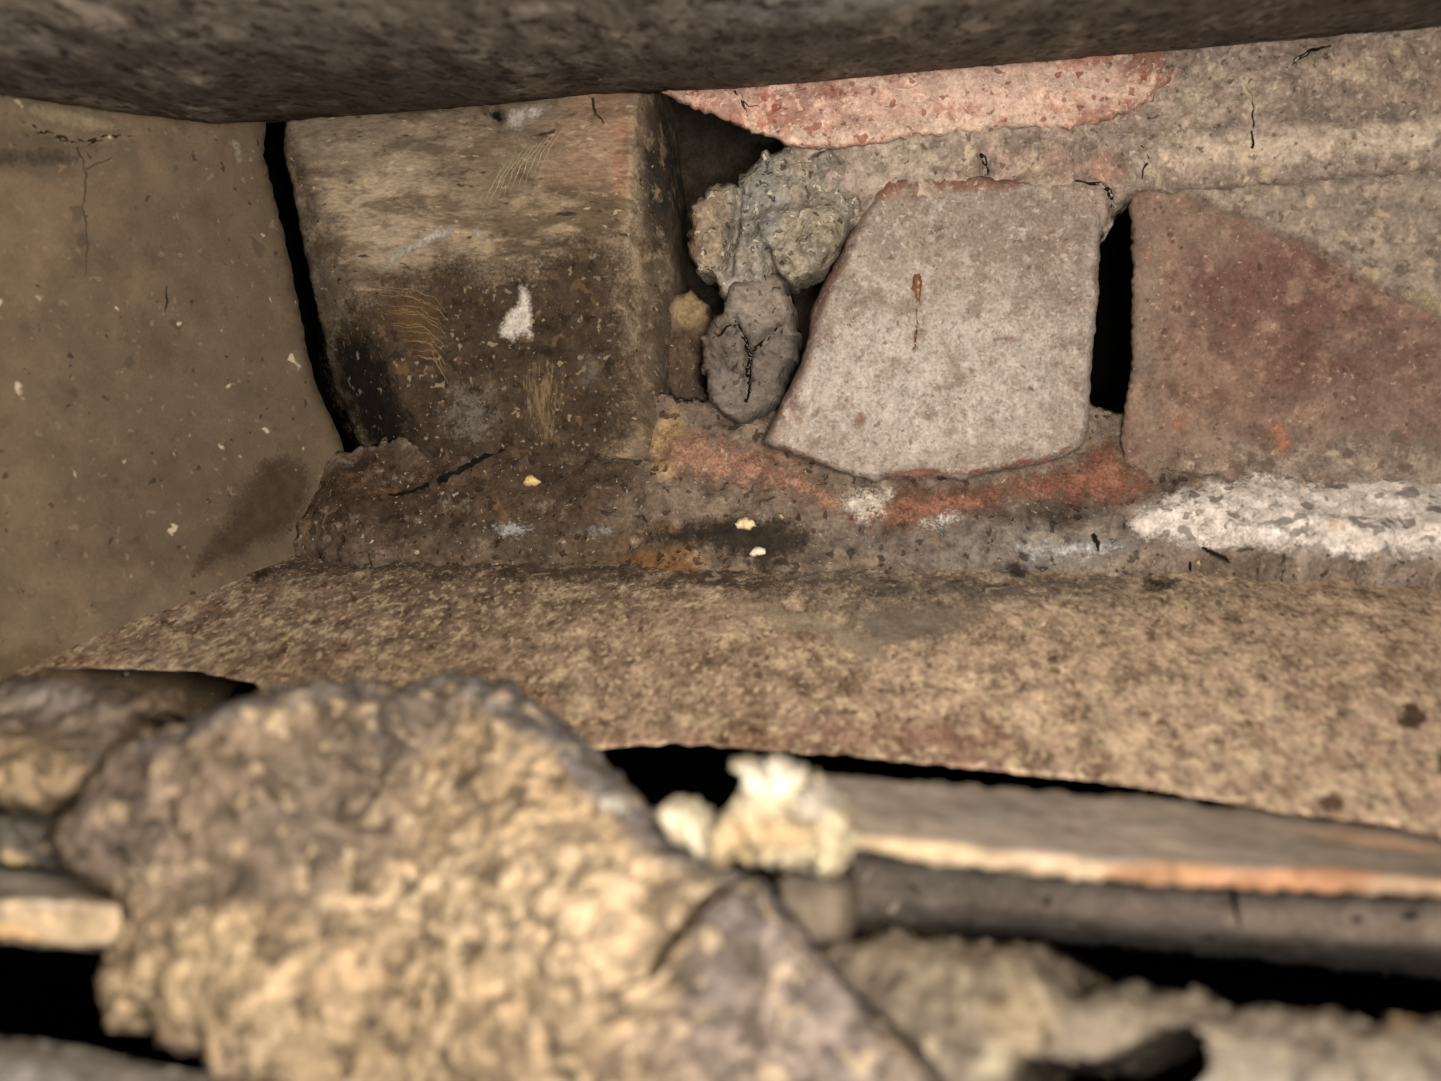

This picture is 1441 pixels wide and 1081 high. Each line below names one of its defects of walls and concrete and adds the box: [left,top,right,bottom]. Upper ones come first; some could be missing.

crack [76,147,113,275]
crack [713,320,780,403]